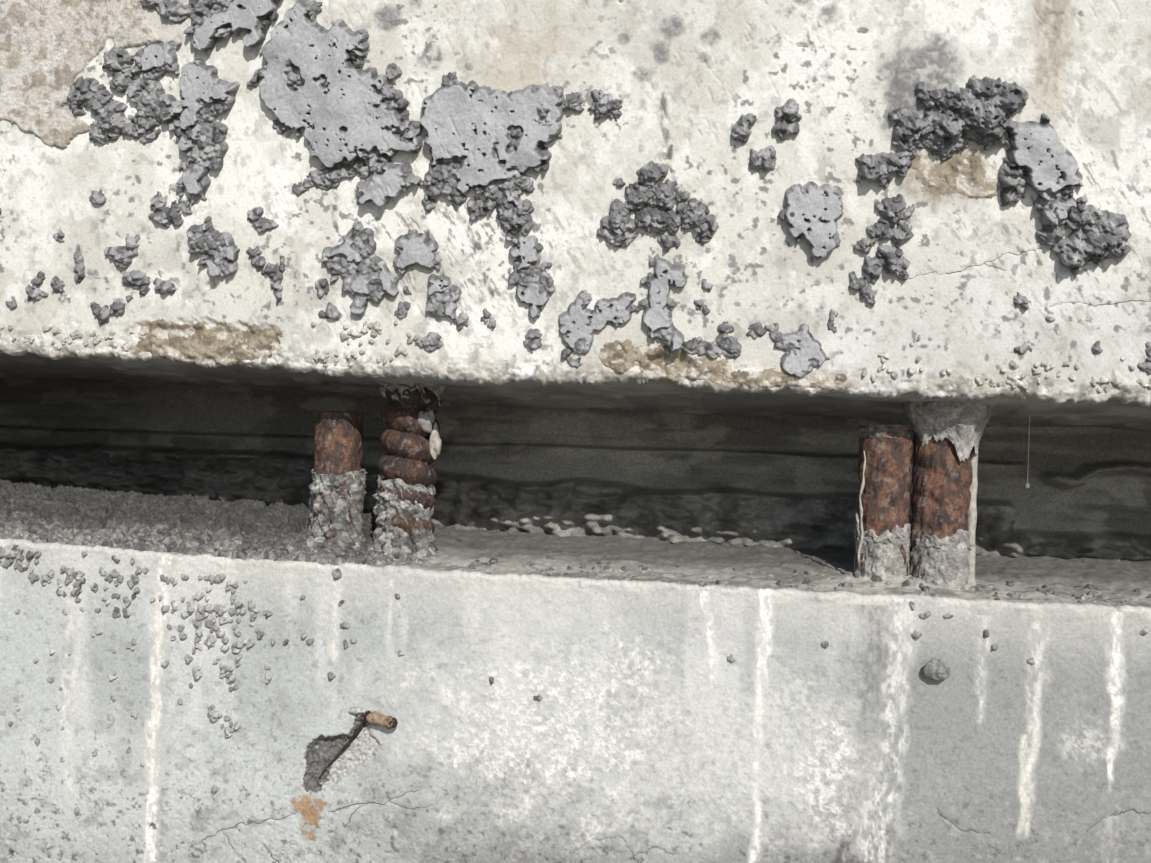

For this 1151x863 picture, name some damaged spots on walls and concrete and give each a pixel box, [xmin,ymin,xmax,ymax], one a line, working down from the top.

peeling [247,0,423,207]
peeling [848,74,1131,306]
peeling [90,234,176,324]
spalling [129,318,284,367]
peeling [315,221,496,331]
peeling [558,161,847,389]
rust [292,796,326,840]
crack [329,790,430,826]
leakage [393,589,920,863]
leakage [977,616,989,719]
efflorescence [1018,604,1048,835]
efflorescence [1066,612,1125,781]